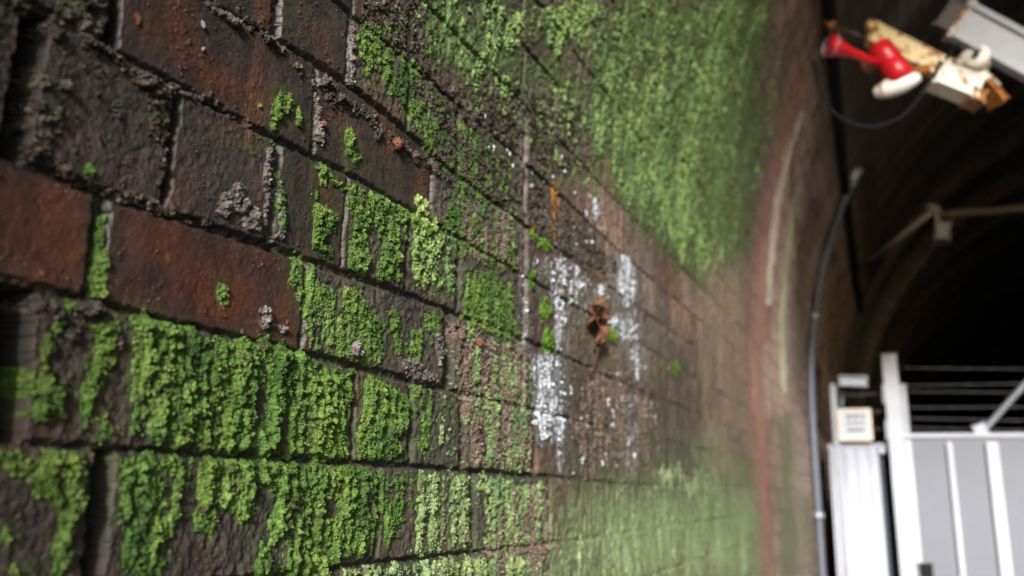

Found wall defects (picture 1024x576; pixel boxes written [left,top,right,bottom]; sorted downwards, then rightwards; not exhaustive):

damp [515,120,646,478]
damp [548,71,815,576]